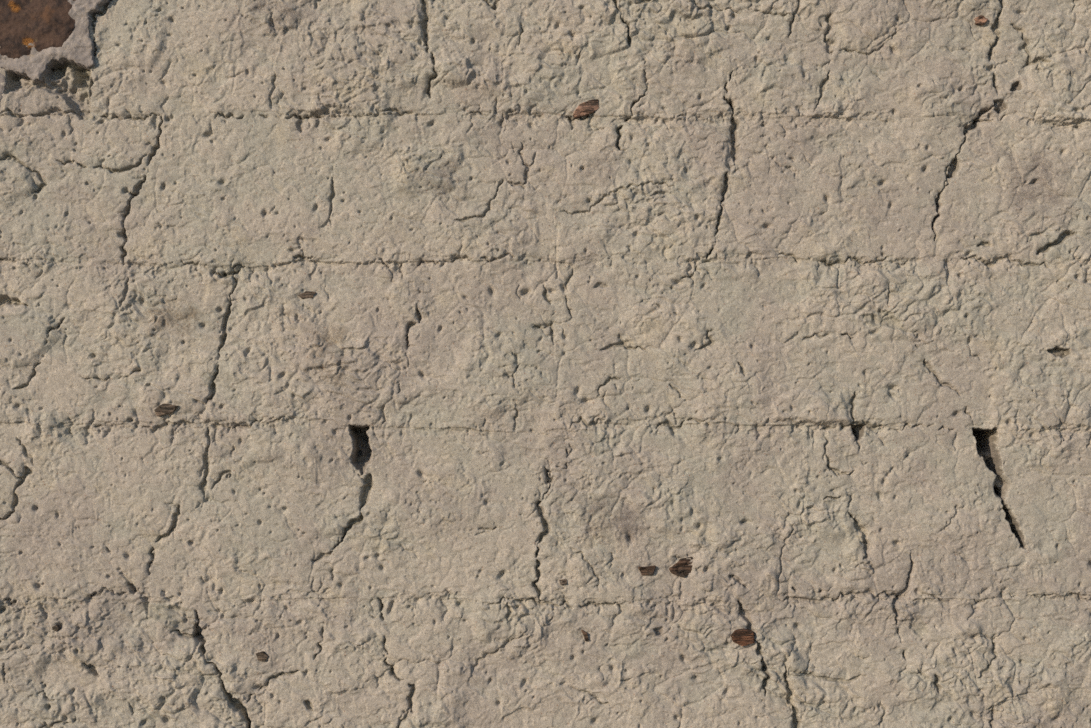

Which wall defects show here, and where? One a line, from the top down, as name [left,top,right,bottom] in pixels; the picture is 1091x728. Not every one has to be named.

flaking render [0,0,111,121]
crack [613,0,651,151]
crack [682,71,766,279]
crack [814,15,897,111]
crack [932,0,1051,239]
crack [962,231,1075,268]
crack [312,474,373,581]
crack [473,377,620,670]
crack [777,347,972,692]
crack [994,474,1008,497]
crack [179,612,324,728]
crack [729,575,866,728]